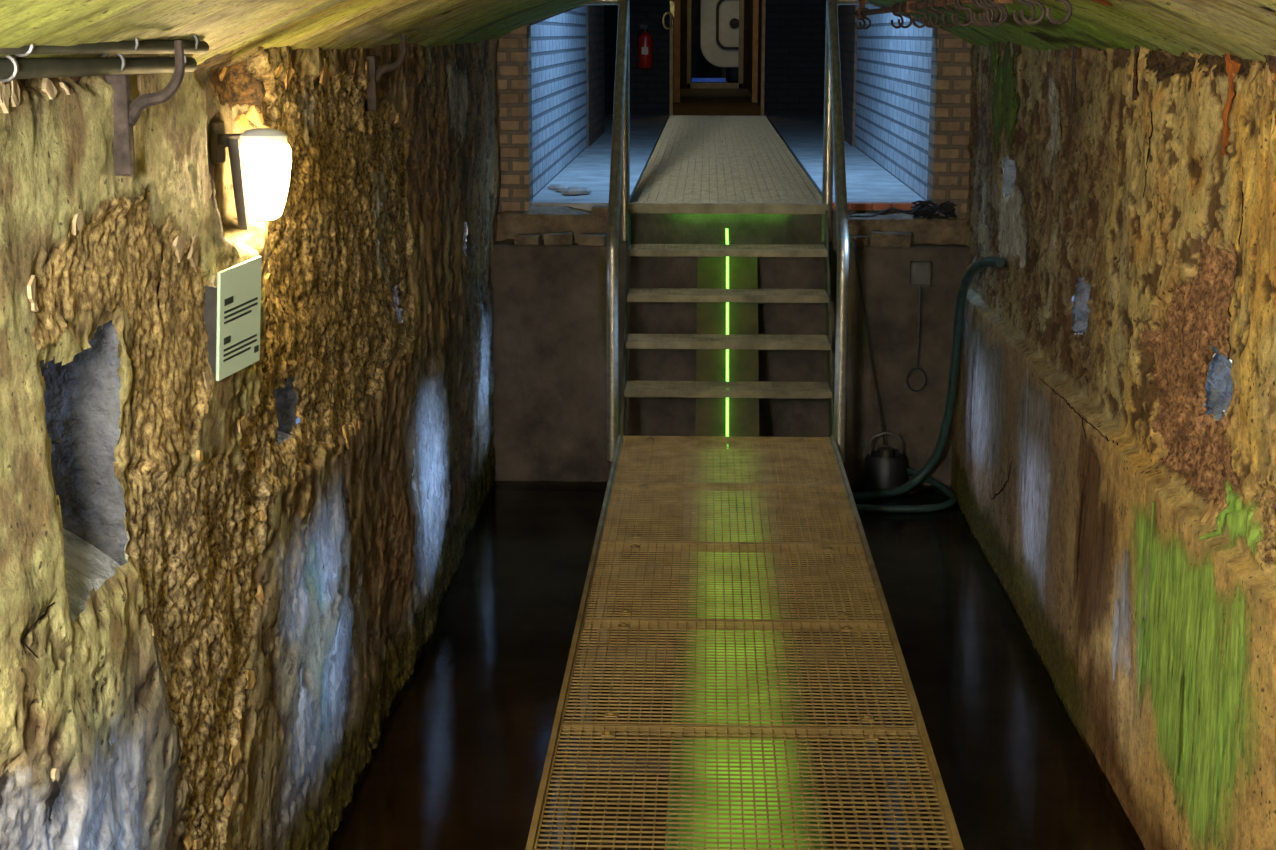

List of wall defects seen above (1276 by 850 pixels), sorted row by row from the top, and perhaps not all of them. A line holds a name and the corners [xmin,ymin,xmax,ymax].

spalling [0,76,90,113]
corrosion [1221,53,1241,155]
spalling [1139,228,1276,565]
spalling [27,51,416,850]
spalling [0,768,69,850]